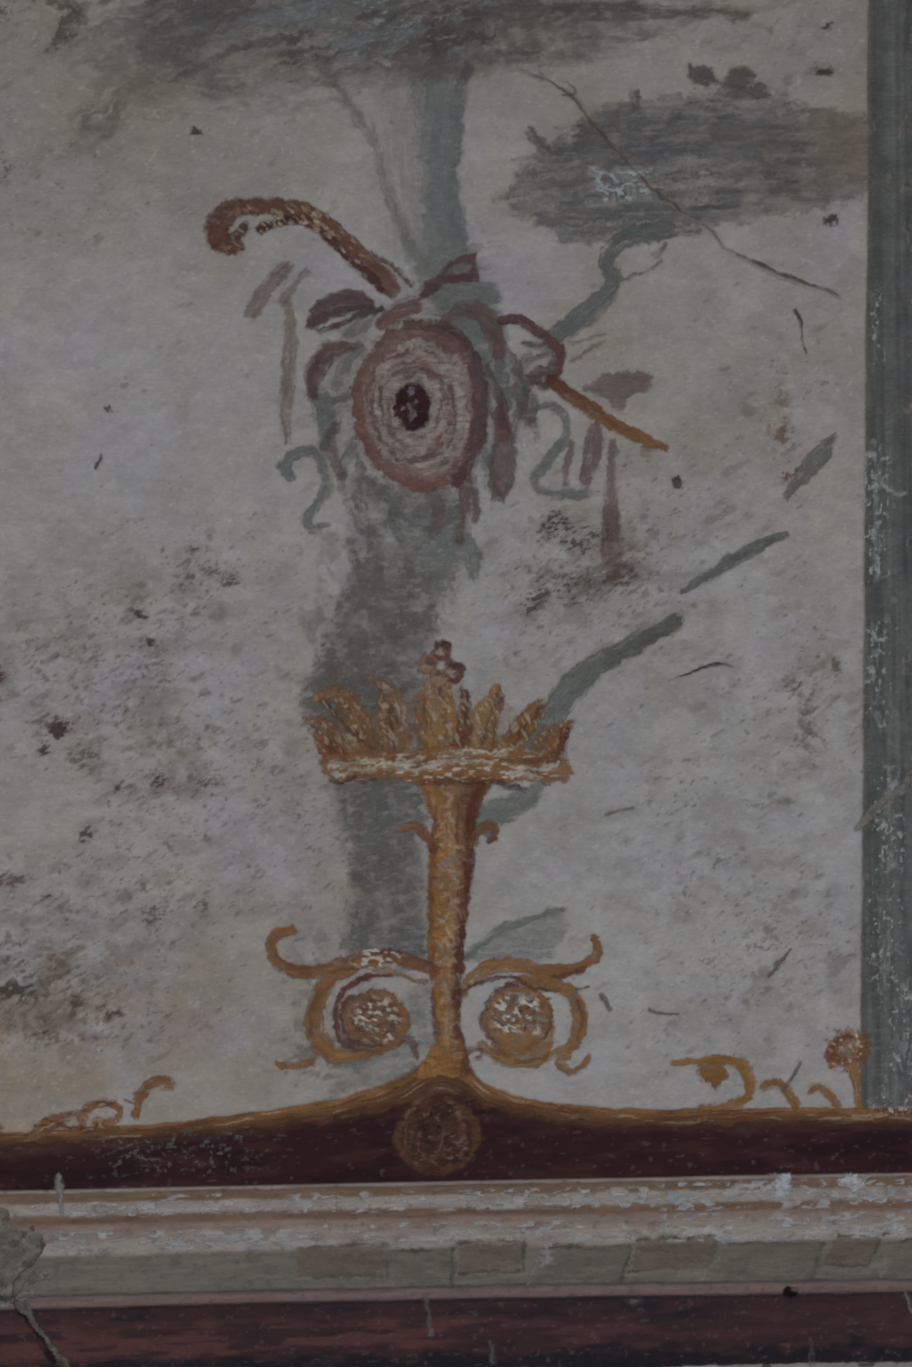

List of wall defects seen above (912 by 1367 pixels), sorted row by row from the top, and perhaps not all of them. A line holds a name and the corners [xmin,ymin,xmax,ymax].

peeling [591,167,717,202]
crack [531,74,838,351]
peeling [864,442,890,577]
peeling [866,620,888,727]
spalling [50,723,66,740]
peeling [868,766,912,1074]
peeling [110,1131,242,1173]
peeling [32,1173,912,1262]
crack [14,1301,70,1367]
spalling [783,1286,798,1298]